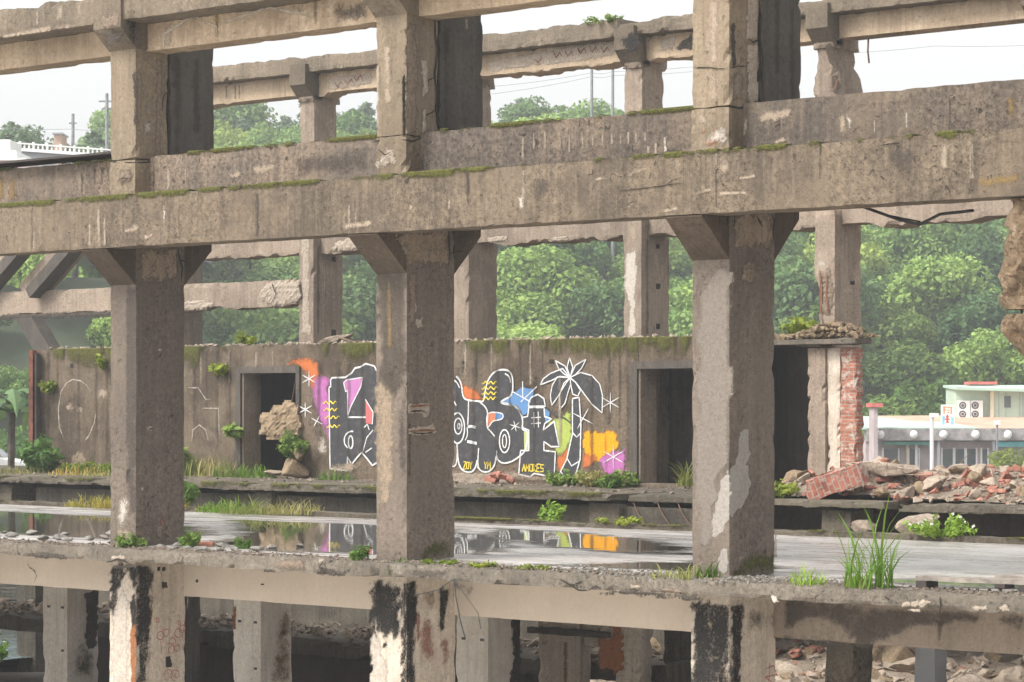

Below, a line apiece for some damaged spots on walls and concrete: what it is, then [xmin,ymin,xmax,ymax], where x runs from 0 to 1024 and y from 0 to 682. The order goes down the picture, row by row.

crack [113,61,171,183]
peeling [677,268,752,573]
water stain [110,566,154,682]
water stain [370,571,445,682]